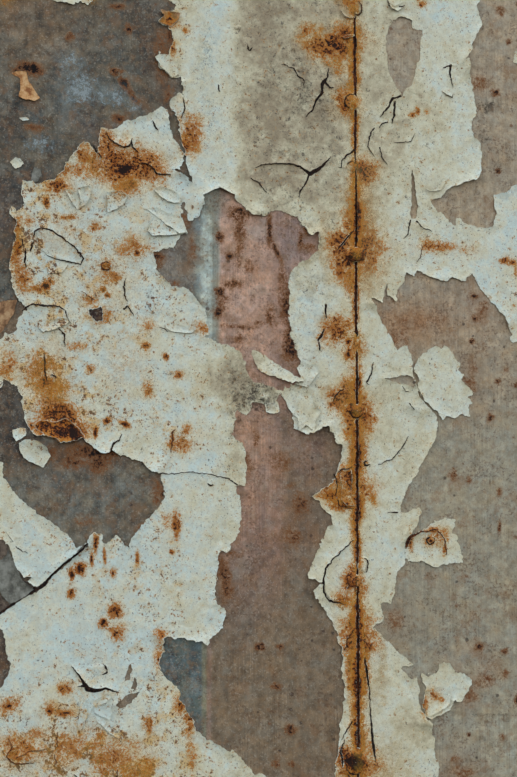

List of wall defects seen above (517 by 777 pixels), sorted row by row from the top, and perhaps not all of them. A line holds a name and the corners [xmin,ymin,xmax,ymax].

peeling [0,0,193,339]
corrosion [43,129,169,209]
crack [251,95,414,196]
peeling [426,0,517,228]
corrosion [0,348,131,474]
crack [0,543,88,614]
peeling [0,379,165,612]
peeling [371,271,517,777]
corrosion [0,724,156,777]
crack [71,666,118,693]
corrosion [172,695,197,776]
crack [339,628,376,777]